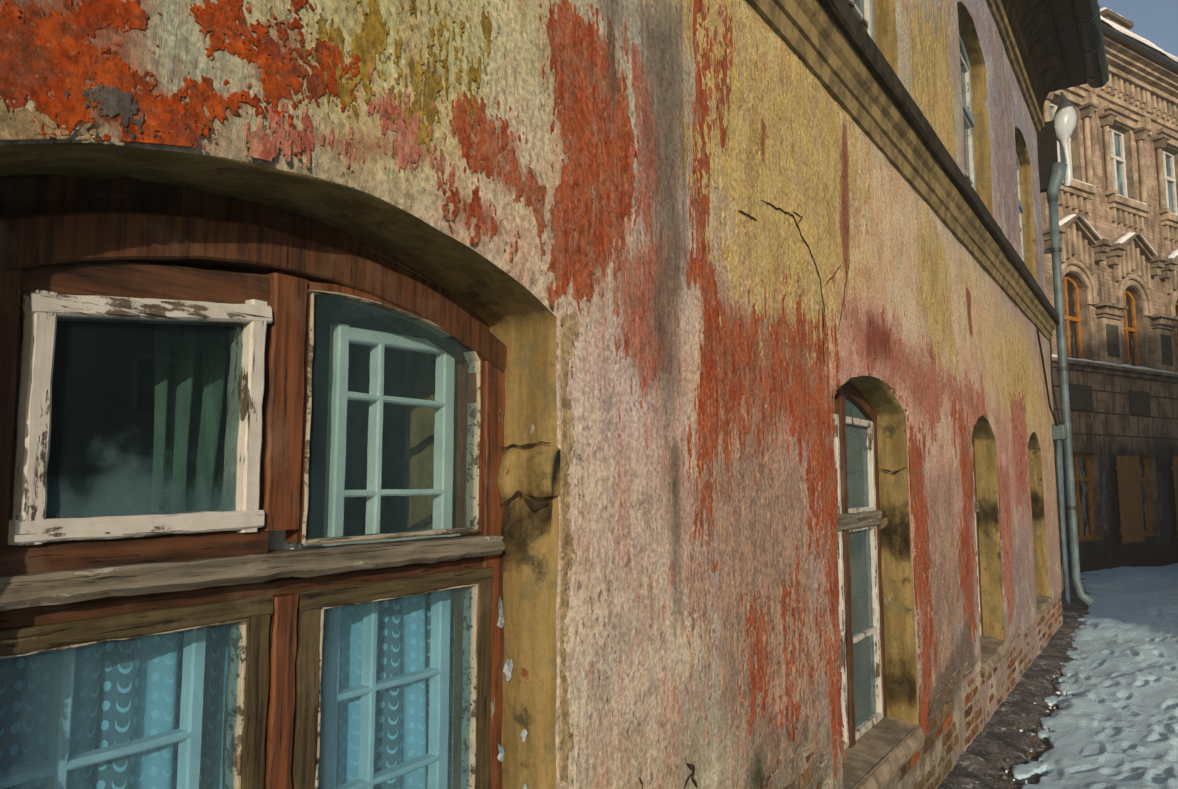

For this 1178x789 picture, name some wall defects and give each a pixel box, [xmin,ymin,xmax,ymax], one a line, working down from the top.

peeling [0,0,681,784]
crack [501,441,550,449]
crack [738,200,850,362]
peeling [680,0,1064,789]